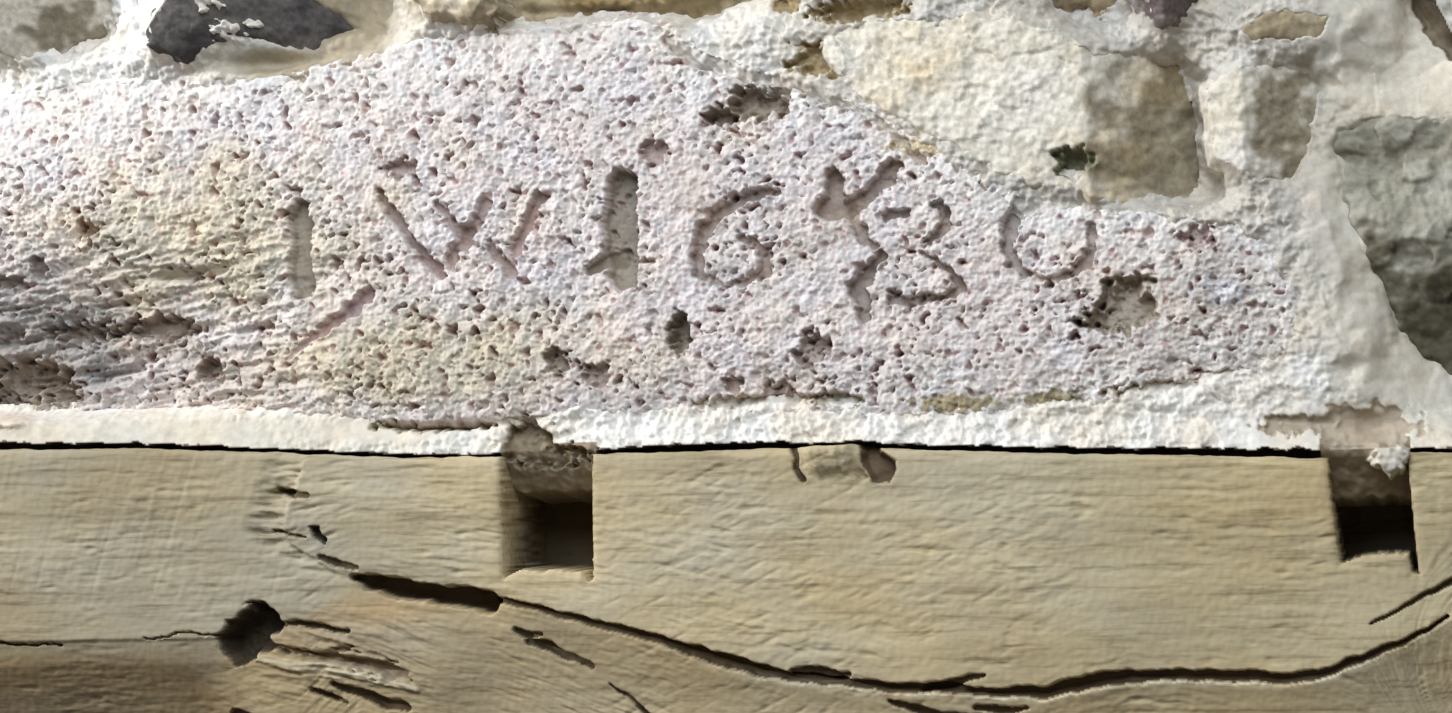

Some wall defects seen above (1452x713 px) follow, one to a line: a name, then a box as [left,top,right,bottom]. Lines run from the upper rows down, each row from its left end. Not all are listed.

crack [0,441,503,458]
crack [1415,446,1452,454]
crack [599,440,1321,484]
crack [275,487,1452,713]
crack [145,631,224,641]
crack [0,641,63,649]